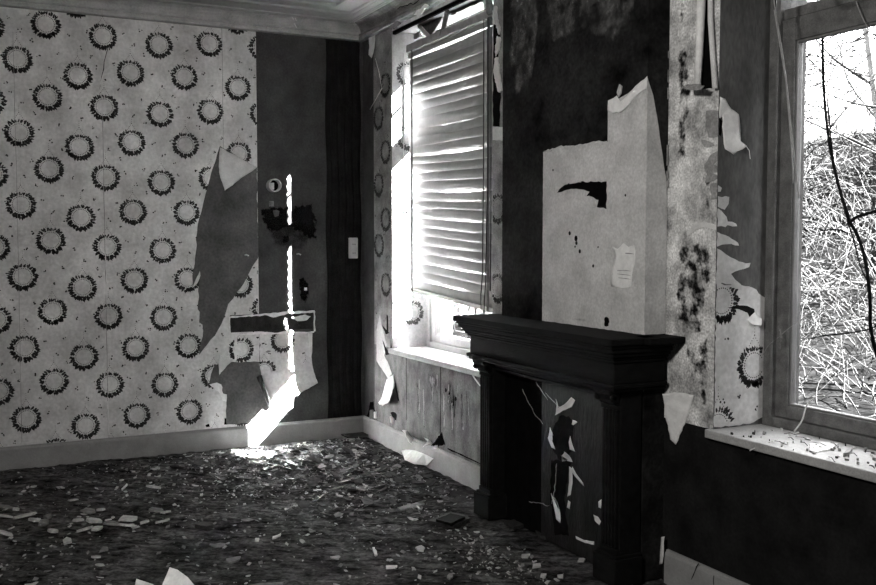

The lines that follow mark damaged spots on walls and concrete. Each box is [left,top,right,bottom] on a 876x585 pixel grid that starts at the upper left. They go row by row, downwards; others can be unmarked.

flaking render [192,146,316,424]
flaking render [542,78,648,335]
damp [678,111,688,155]
damp [679,51,690,96]
damp [677,244,709,404]